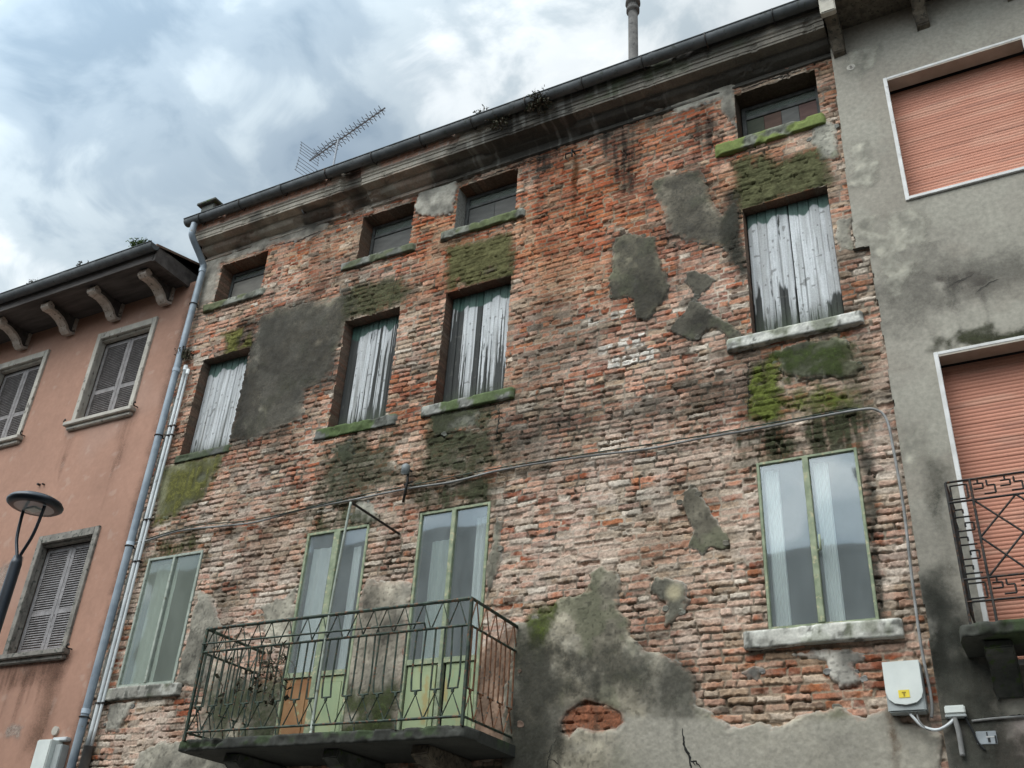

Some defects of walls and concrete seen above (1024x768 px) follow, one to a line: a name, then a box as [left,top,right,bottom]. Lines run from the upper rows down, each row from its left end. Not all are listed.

crack [682,728,701,768]
peeling [471,566,944,768]